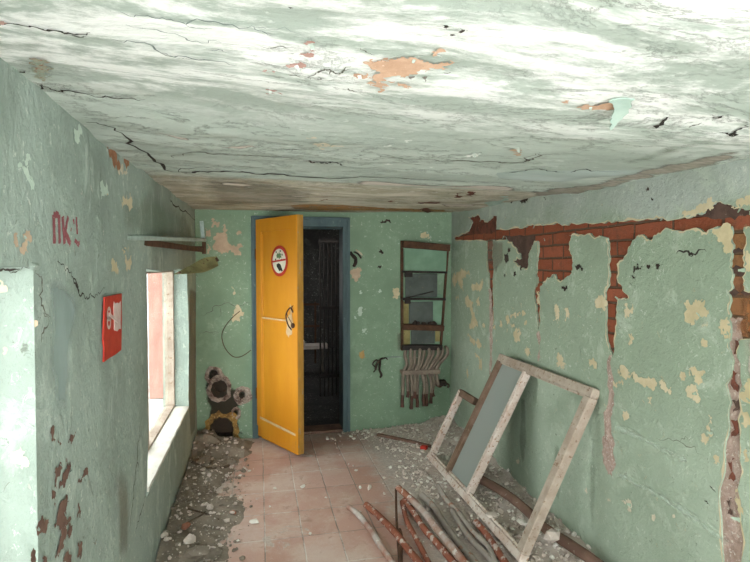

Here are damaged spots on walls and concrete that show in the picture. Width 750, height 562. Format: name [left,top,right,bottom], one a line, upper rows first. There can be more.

crack [4,23,88,38]
crack [40,84,145,101]
crack [113,12,298,66]
peeling [286,39,316,72]
crack [287,67,358,92]
peeling [353,48,455,93]
peeling [576,98,635,130]
crack [89,122,382,179]
peeling [205,218,243,256]
crack [58,261,103,300]
spalling [452,195,750,562]
spalling [31,458,82,562]